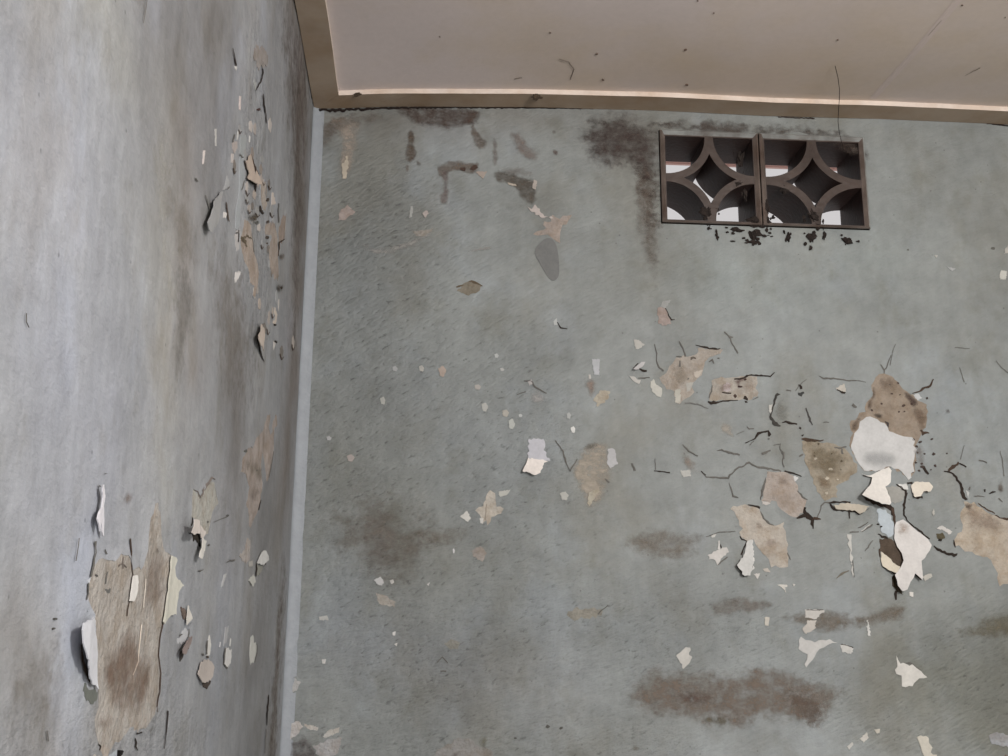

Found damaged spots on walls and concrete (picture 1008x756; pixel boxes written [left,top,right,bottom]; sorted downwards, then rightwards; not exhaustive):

damp [401,108,478,127]
damp [438,162,535,203]
peeling [205,121,295,361]
peeling [630,339,728,409]
crack [631,344,896,498]
crack [797,502,829,529]
peeling [708,370,933,600]
crack [896,484,957,557]
crack [944,447,1005,502]
peeling [950,497,1008,590]
peeling [81,473,193,756]
damp [636,669,833,724]